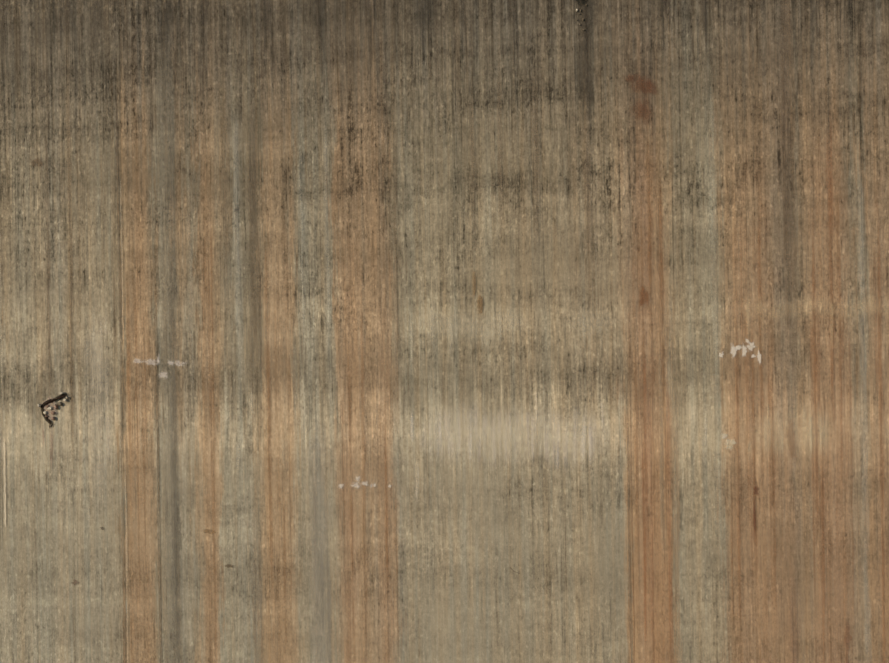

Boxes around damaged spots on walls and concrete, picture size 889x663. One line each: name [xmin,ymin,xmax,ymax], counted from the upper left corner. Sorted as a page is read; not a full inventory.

spalling [37,392,69,428]